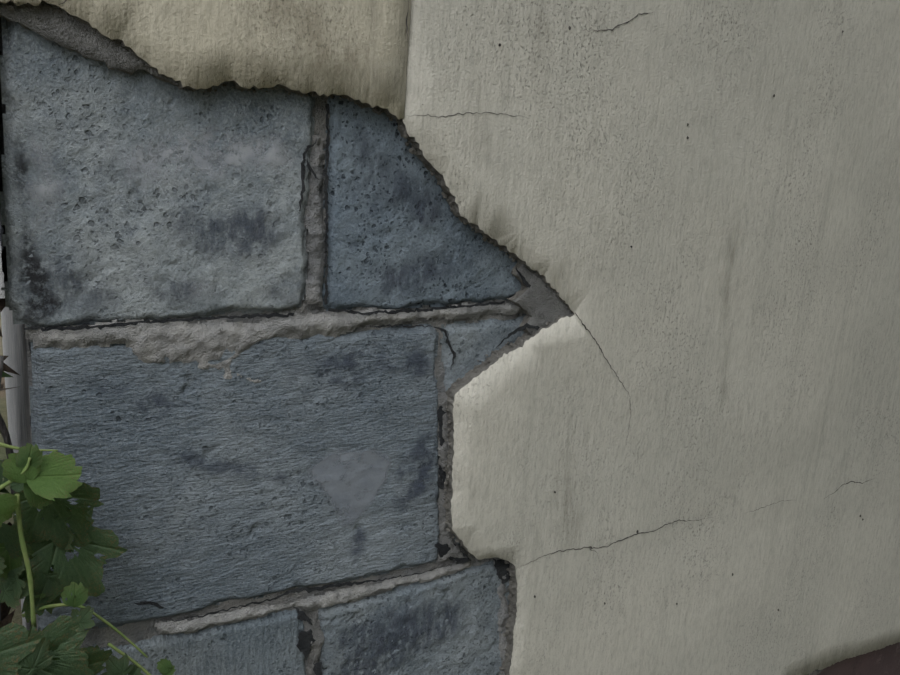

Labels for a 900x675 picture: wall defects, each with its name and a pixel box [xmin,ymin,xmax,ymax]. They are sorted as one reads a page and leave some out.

crack [587,12,653,32]
crack [405,0,527,118]
crack [299,104,505,367]
crack [516,268,531,288]
crack [24,312,294,332]
spalling [0,2,572,675]
crack [497,323,540,347]
crack [575,313,631,445]
crack [523,509,707,566]